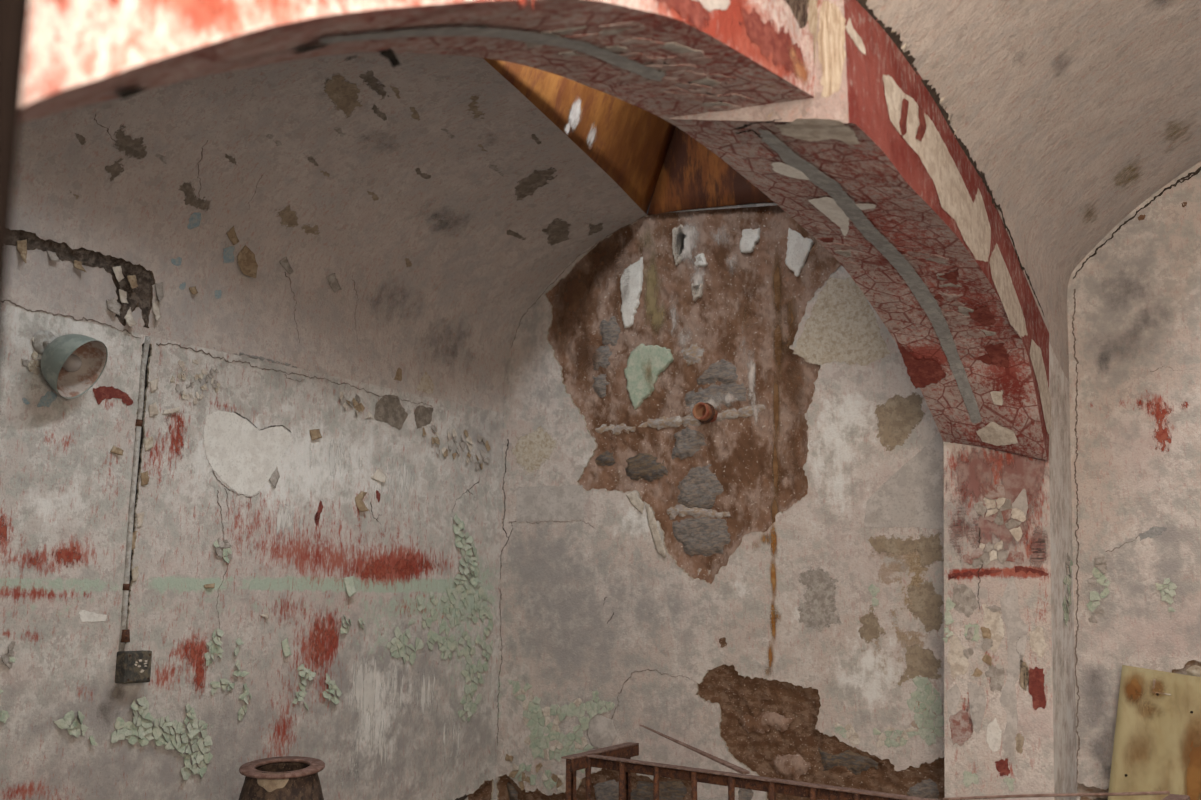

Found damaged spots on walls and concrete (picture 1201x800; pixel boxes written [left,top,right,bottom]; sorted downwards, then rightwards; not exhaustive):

peeling [695,0,730,12]
spalling [16,230,164,328]
crack [5,300,432,407]
spalling [544,197,891,584]
crack [857,0,1201,778]
peeling [121,344,220,645]
peeling [54,696,213,780]
crack [452,439,594,745]
peeling [467,679,691,800]
corrosion [762,527,779,673]
spalling [696,532,1002,800]
spalling [1171,660,1201,677]